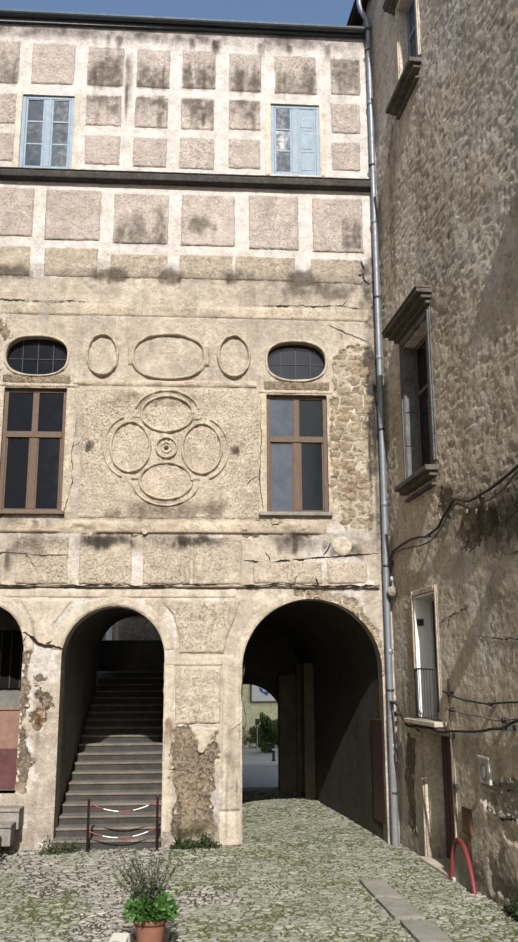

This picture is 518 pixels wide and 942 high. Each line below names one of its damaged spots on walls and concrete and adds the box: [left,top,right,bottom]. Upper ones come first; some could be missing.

water stain [88,60,167,121]
water stain [184,65,215,120]
water stain [234,69,260,115]
spalling [0,319,13,340]
spalling [328,344,376,531]
crack [0,543,380,588]
crack [480,635,518,662]
spalling [14,645,55,794]
spalling [168,725,221,840]